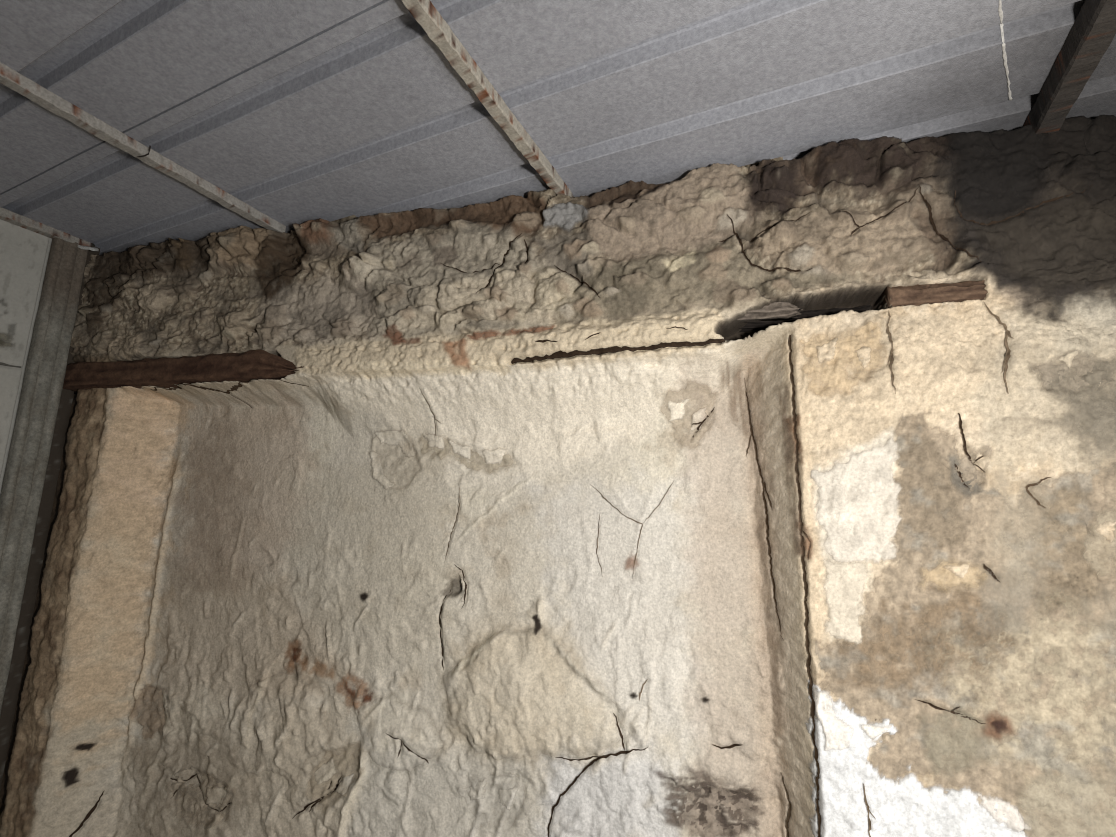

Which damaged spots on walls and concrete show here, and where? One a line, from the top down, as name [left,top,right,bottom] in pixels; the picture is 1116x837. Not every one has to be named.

crack [511,326,725,364]
water stain [1055,362,1116,458]
water stain [950,458,980,495]
crack [955,413,985,489]
crack [744,335,821,837]
rust [287,641,305,667]
peeling [806,414,1116,837]
rust [338,675,372,709]
rust [984,716,1011,738]
crack [547,713,648,837]
water stain [658,771,758,837]
water stain [1021,775,1116,837]